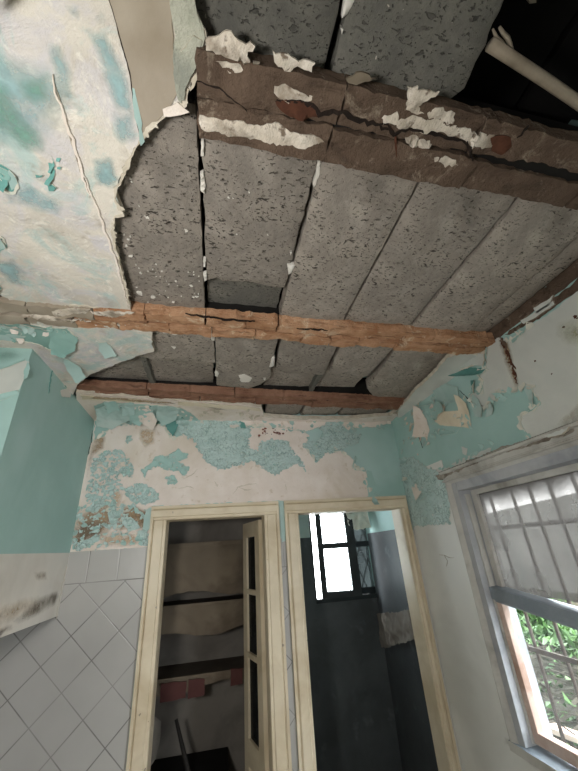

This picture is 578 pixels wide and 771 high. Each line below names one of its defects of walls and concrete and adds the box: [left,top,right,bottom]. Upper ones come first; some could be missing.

water stain [0,62,57,144]
crack [196,81,247,112]
crack [275,99,474,162]
peeling [382,85,495,149]
peeling [434,156,457,168]
crack [490,125,529,155]
peeling [0,0,393,552]
crack [185,313,255,322]
crack [297,325,328,333]
peeling [400,259,578,480]